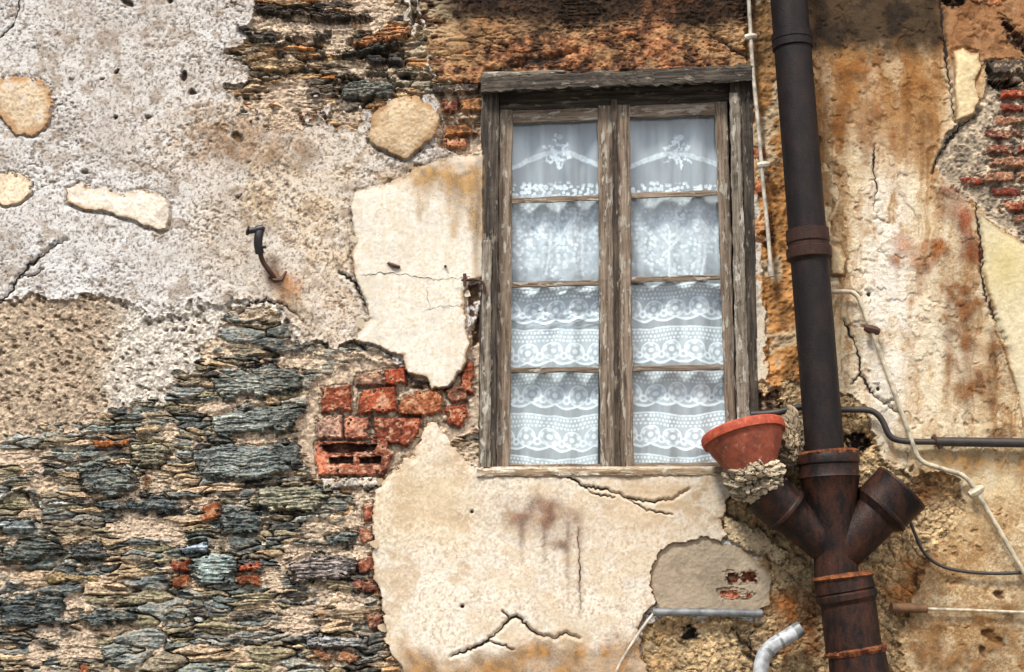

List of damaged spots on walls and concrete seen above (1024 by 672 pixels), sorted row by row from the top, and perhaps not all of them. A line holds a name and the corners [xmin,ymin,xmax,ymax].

spalling [934,48,1024,243]
peeling [221,0,483,389]
rust [925,238,949,269]
rust [939,186,980,262]
crack [339,272,467,309]
spalling [0,291,829,672]
water stain [512,499,556,528]
crack [567,477,685,515]
spalling [840,392,968,672]
rust [811,570,875,582]
crack [451,612,572,657]
rust [774,593,887,659]